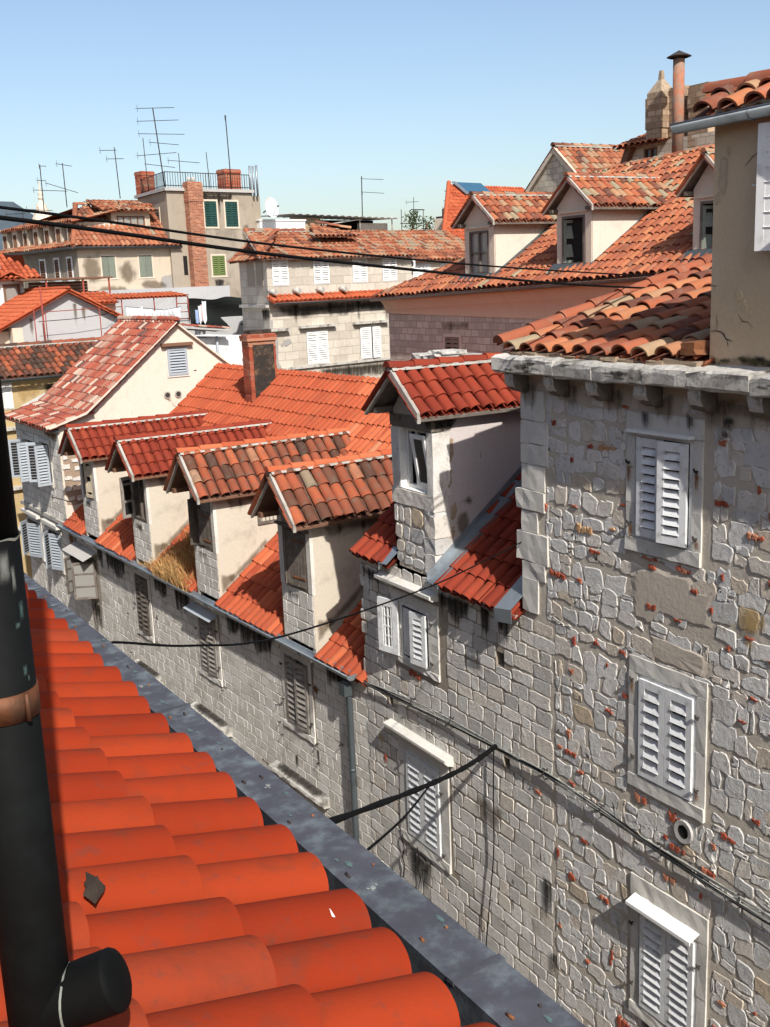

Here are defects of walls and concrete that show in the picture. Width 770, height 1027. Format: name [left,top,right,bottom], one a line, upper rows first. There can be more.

water stain [410,847,431,884]
water stain [543,878,551,911]